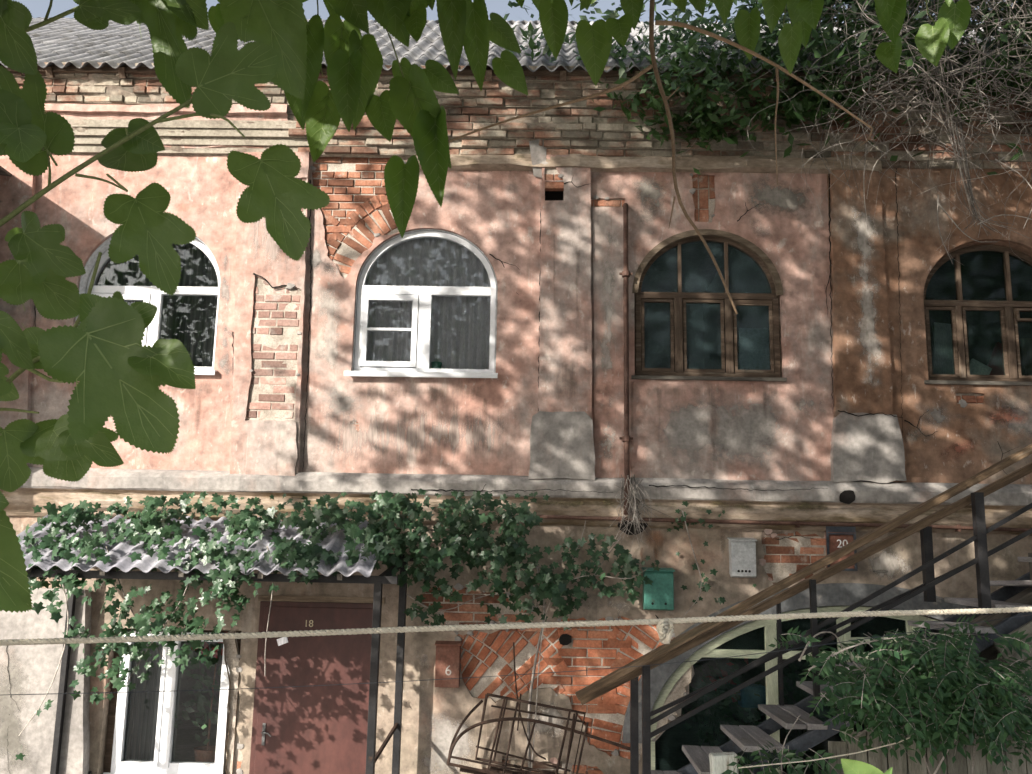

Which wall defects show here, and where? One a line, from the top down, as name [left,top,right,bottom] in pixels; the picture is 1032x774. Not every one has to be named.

flaking render [299,157,399,279]
flaking render [689,173,715,222]
flaking render [246,276,301,421]
crack [826,168,937,439]
flaking render [759,529,827,584]
flaking render [414,583,694,760]
flaking render [502,756,604,774]